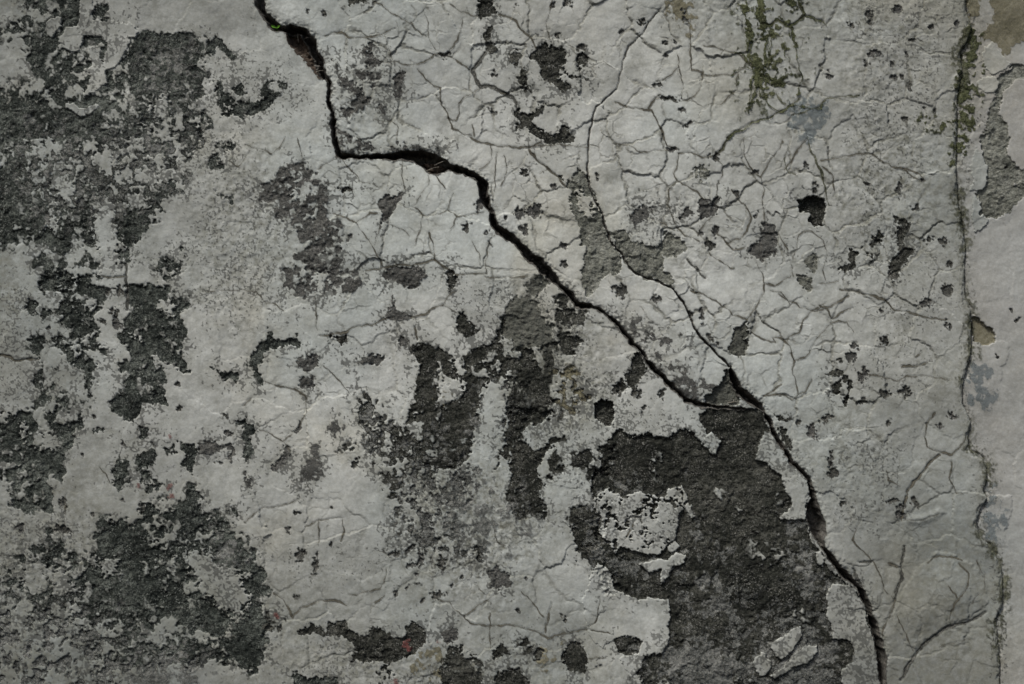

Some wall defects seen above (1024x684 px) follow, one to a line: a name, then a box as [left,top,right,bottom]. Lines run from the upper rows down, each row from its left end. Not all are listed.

spalling [969,41,1024,233]
spalling [797,181,826,227]
peeling [251,162,362,299]
spalling [97,284,125,330]
peeling [496,275,555,352]
crack [228,0,1011,684]
spalling [796,414,834,441]
spalling [826,450,839,479]
peeling [262,611,286,633]
peeling [292,620,426,684]
peeling [614,635,643,656]